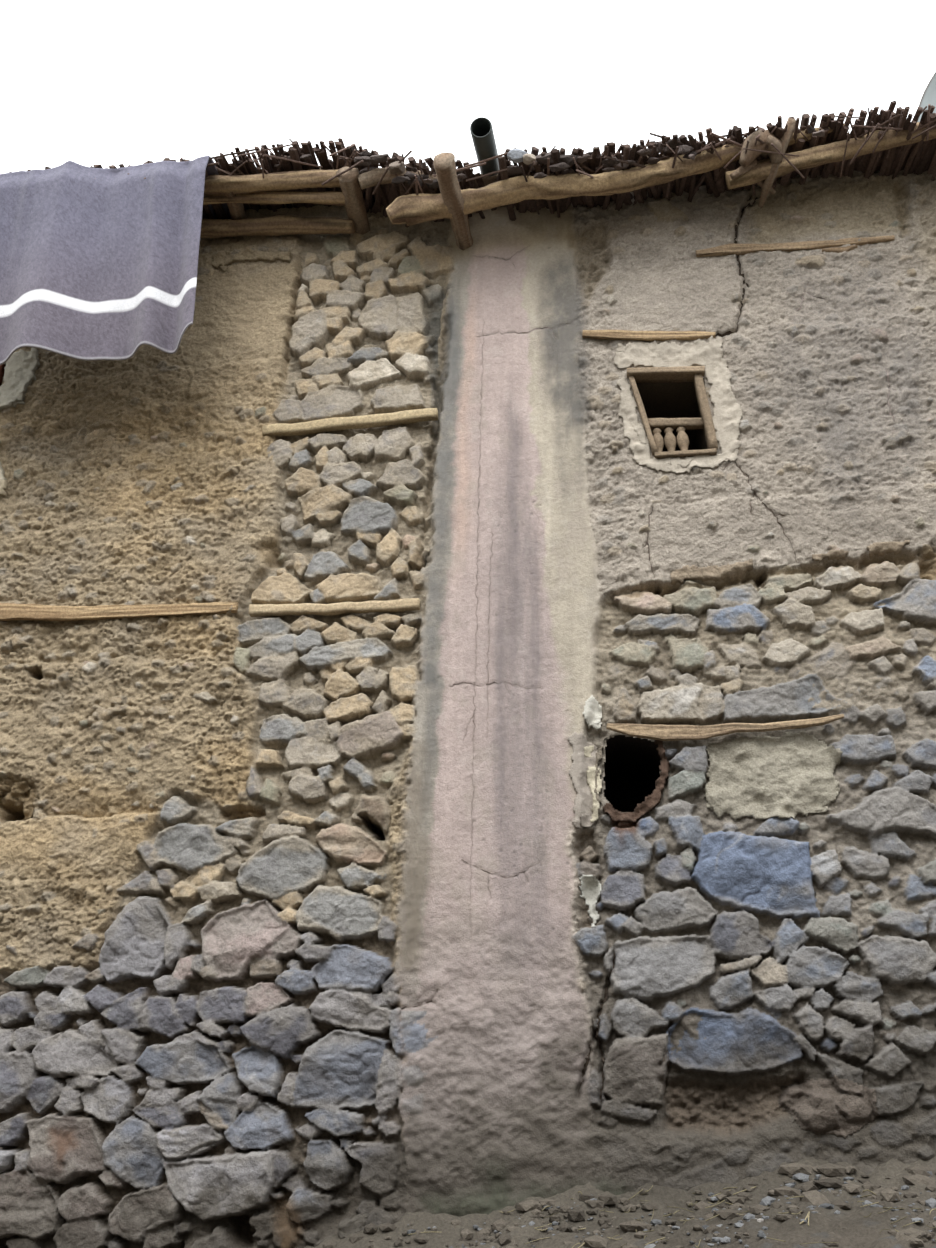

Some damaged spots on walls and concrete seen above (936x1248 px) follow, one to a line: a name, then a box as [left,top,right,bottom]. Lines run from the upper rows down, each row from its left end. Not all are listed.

damp [427,294,446,366]
crack [716,196,761,337]
crack [711,455,797,563]
crack [451,323,570,937]
crack [578,953,616,1106]